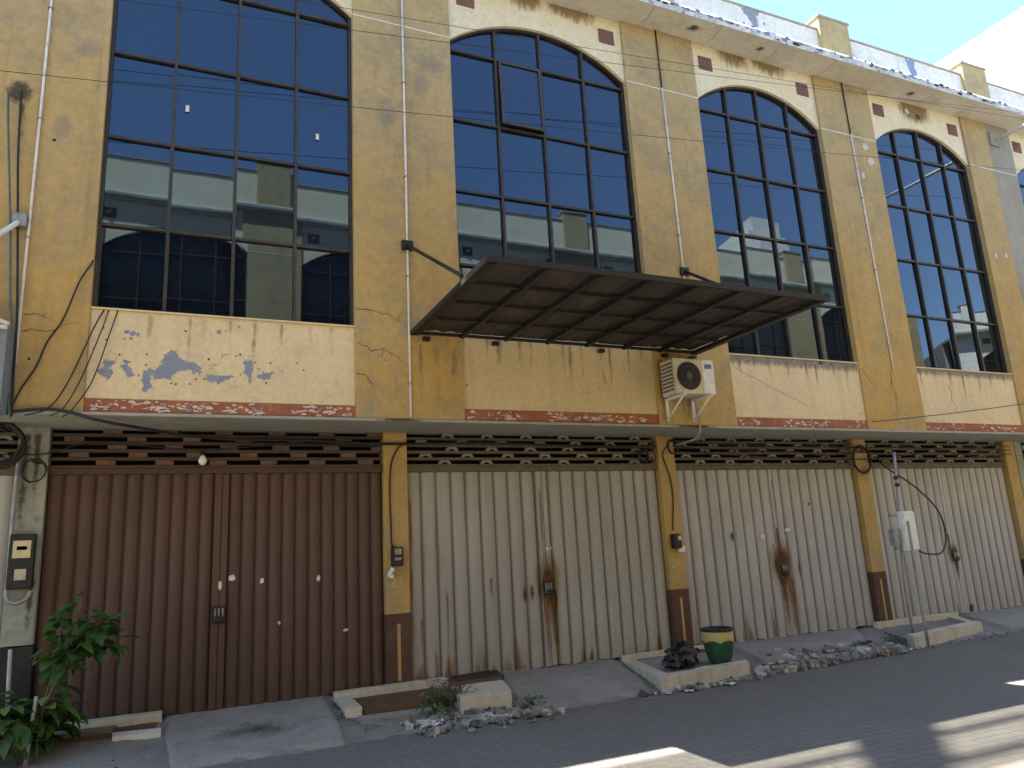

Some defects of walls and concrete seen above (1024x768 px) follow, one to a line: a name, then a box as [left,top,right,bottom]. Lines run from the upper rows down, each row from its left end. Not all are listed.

peeling [649,0,1008,106]
peeling [89,327,283,415]
peeling [291,405,352,417]
crack [356,341,409,412]
peeling [547,411,647,423]
rust [524,563,558,652]
rust [774,528,801,621]